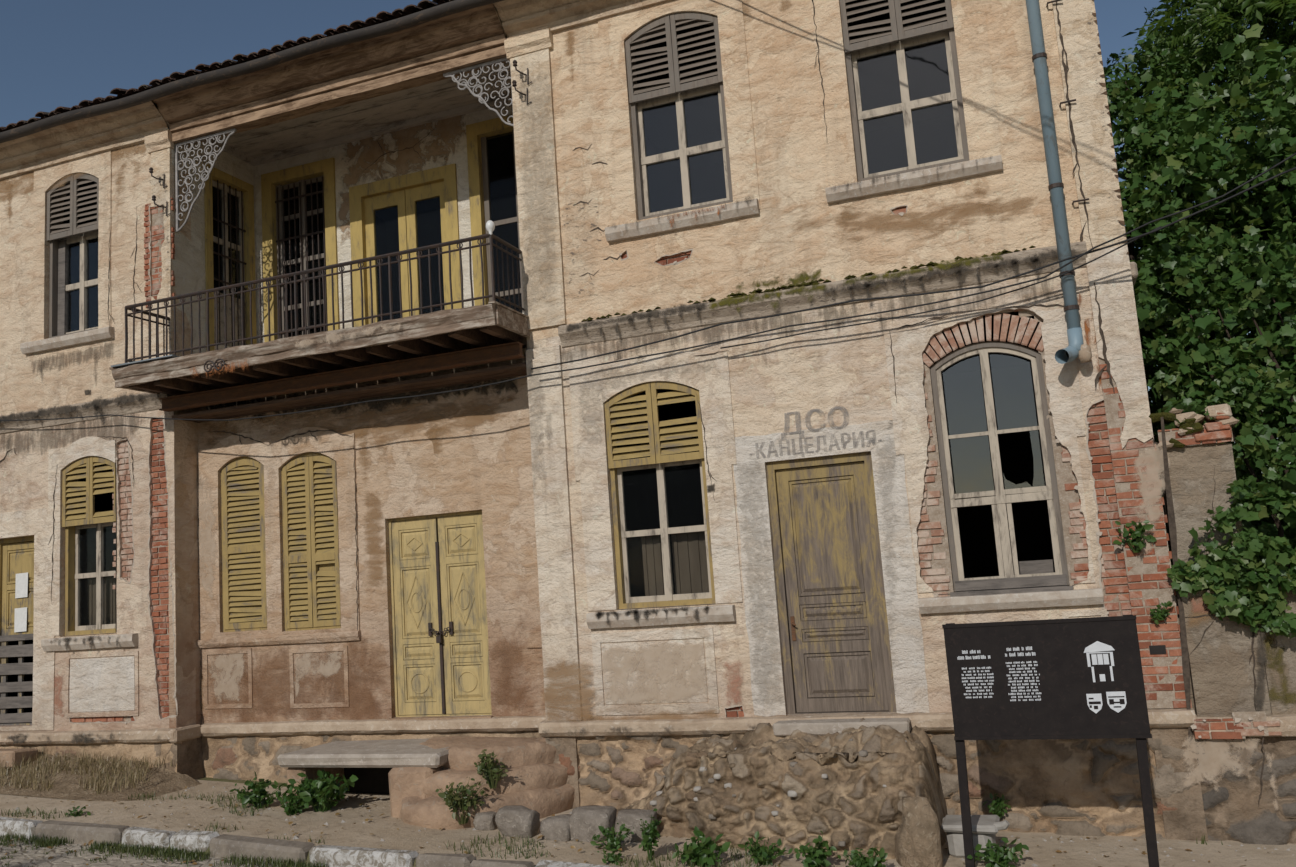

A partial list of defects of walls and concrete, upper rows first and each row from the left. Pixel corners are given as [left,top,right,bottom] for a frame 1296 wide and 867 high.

crack [1056,2,1094,250]
flaking render [144,174,175,323]
water stain [837,190,1033,235]
crack [996,302,1064,310]
crack [1094,283,1115,392]
flaking render [112,415,178,720]
flaking render [917,308,1282,739]
flaking render [69,711,136,725]
peeling [210,653,244,701]
peeling [295,652,341,695]